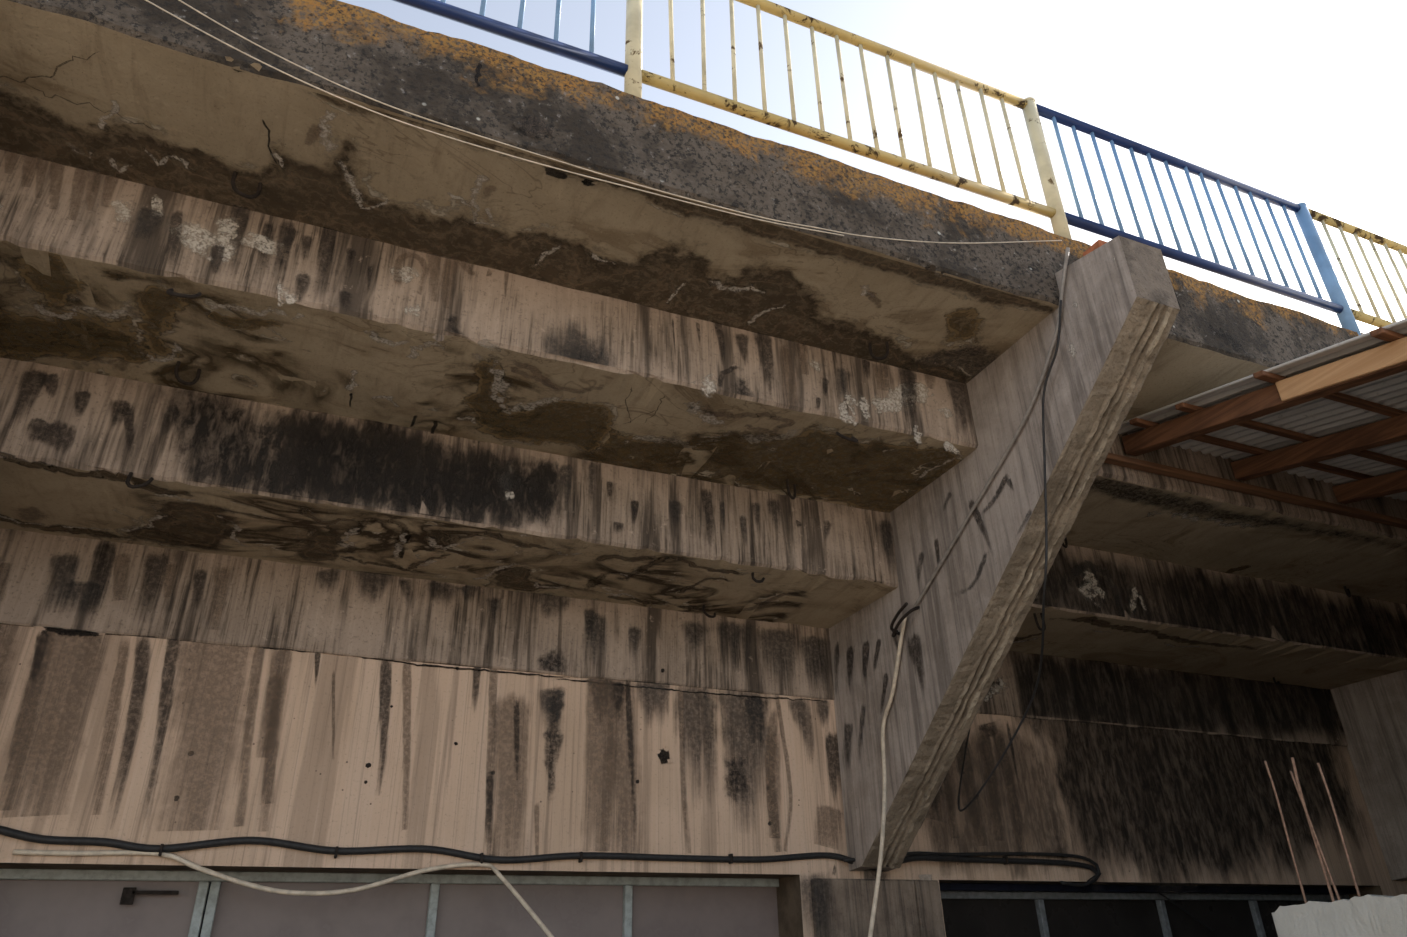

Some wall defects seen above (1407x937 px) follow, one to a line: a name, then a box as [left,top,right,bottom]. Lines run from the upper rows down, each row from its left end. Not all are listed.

spalling [542,165,598,186]
spalling [433,313,462,341]
damp [0,84,1053,855]
damp [1092,479,1379,541]
damp [930,548,1407,888]